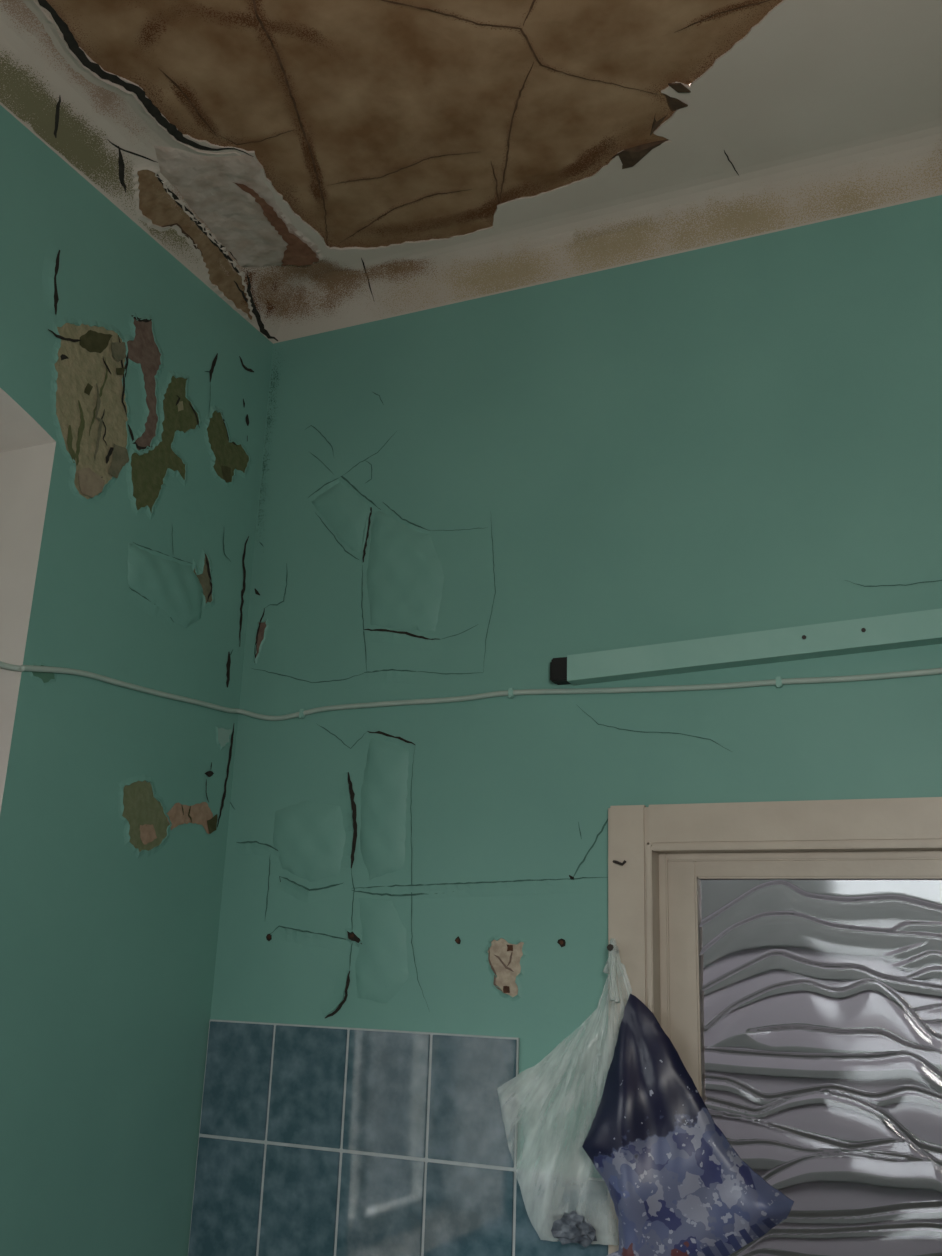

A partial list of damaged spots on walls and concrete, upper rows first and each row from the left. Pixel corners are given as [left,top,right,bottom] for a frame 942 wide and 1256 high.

crack [674,0,770,33]
peeling [131,163,256,323]
spalling [233,182,324,267]
crack [22,0,655,300]
water stain [0,0,942,328]
peeling [610,83,691,169]
peeling [48,311,252,520]
peeling [118,725,233,859]
spalling [484,934,528,1002]